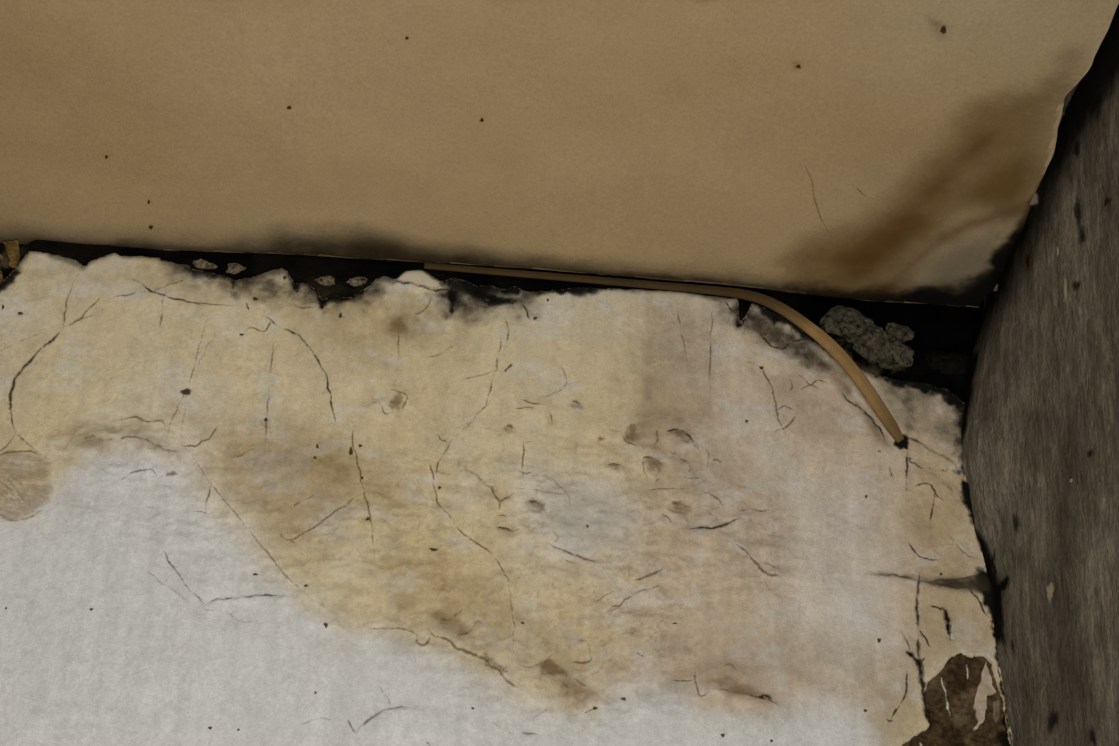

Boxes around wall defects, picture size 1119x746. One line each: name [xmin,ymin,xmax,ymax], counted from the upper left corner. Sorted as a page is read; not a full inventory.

damp [794,4,1119,333]
peeling [398,271,444,287]
crack [396,280,460,314]
crack [2,295,95,452]
crack [121,288,373,542]
crack [748,334,806,428]
crack [430,437,506,576]
crack [693,494,776,576]
spalling [931,606,955,640]
crack [878,438,1012,746]
spalling [902,653,1011,746]